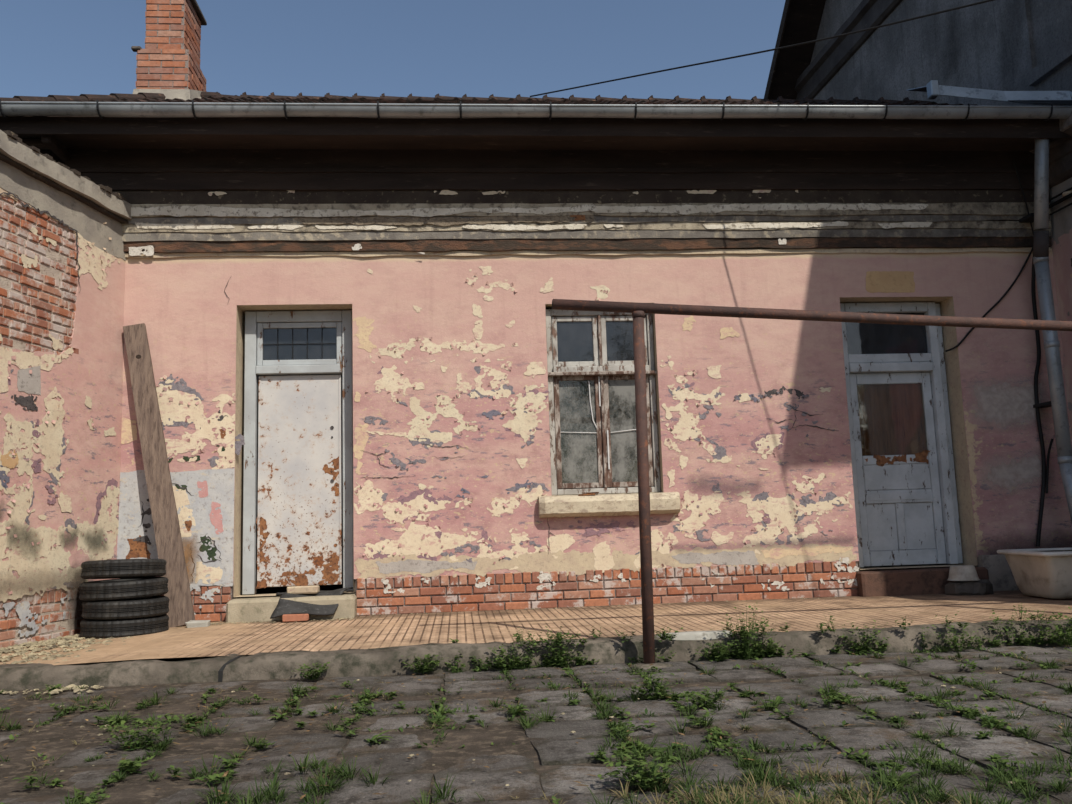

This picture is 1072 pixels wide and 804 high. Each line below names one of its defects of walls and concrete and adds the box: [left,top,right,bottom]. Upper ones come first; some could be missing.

peeling [131,190,932,245]
flaking render [0,195,158,637]
flaking render [155,374,245,615]
peeling [353,266,859,594]